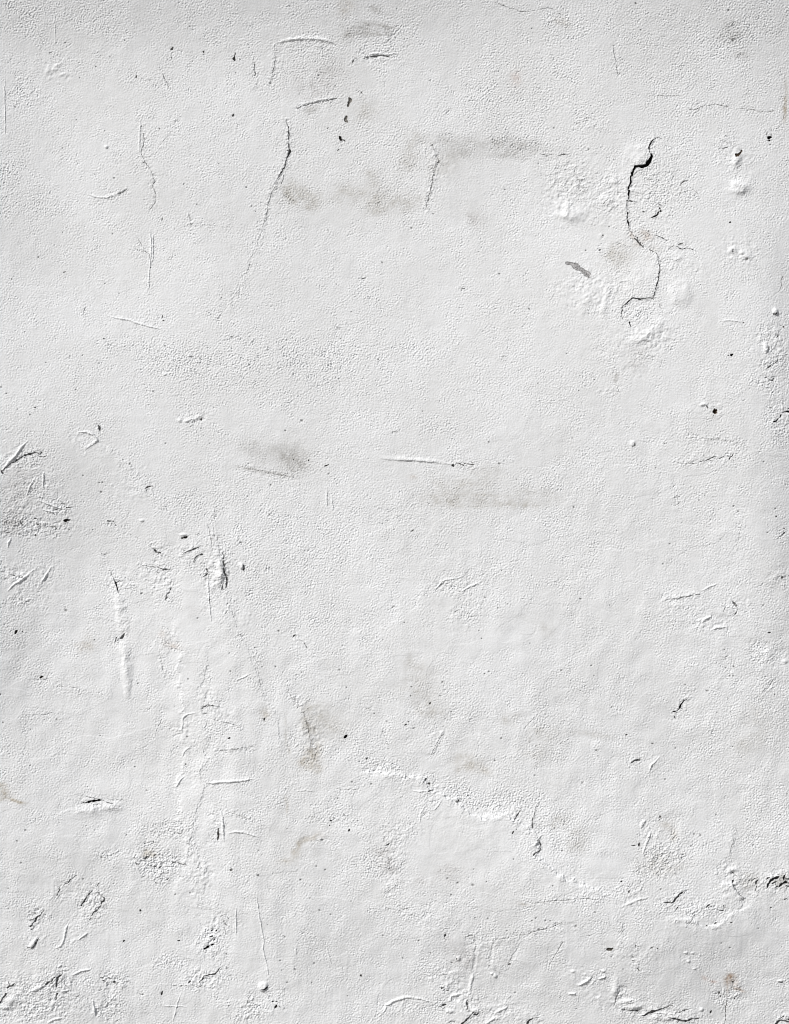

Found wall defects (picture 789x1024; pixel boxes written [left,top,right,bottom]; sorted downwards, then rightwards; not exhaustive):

crack [621,136,699,328]